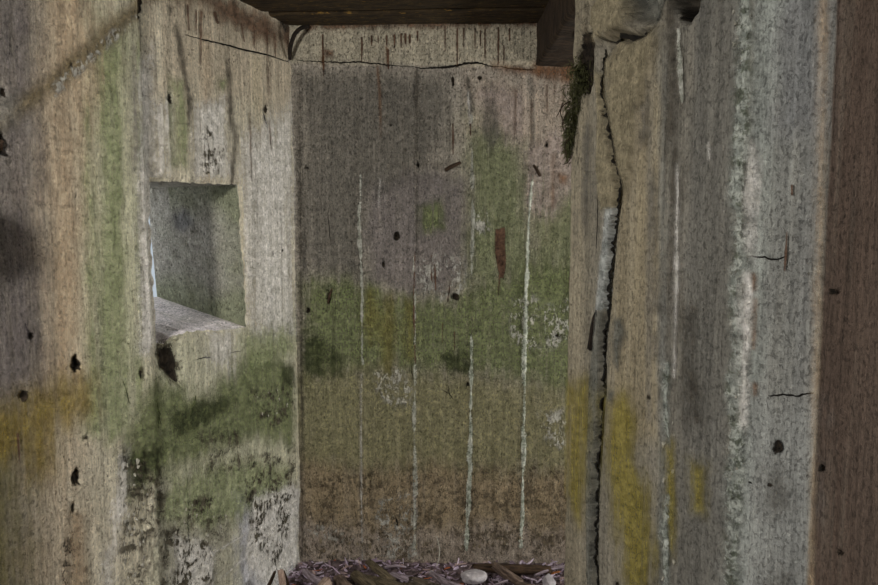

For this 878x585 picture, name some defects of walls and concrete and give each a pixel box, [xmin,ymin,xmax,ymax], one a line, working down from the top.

crack [187,35,536,71]
water stain [666,0,701,137]
spalling [680,0,701,22]
water stain [376,365,418,560]
water stain [413,144,489,344]
water stain [464,335,474,551]
corrosion [495,227,506,295]
water stain [510,133,572,549]
crack [589,20,660,585]
crack [768,390,814,398]